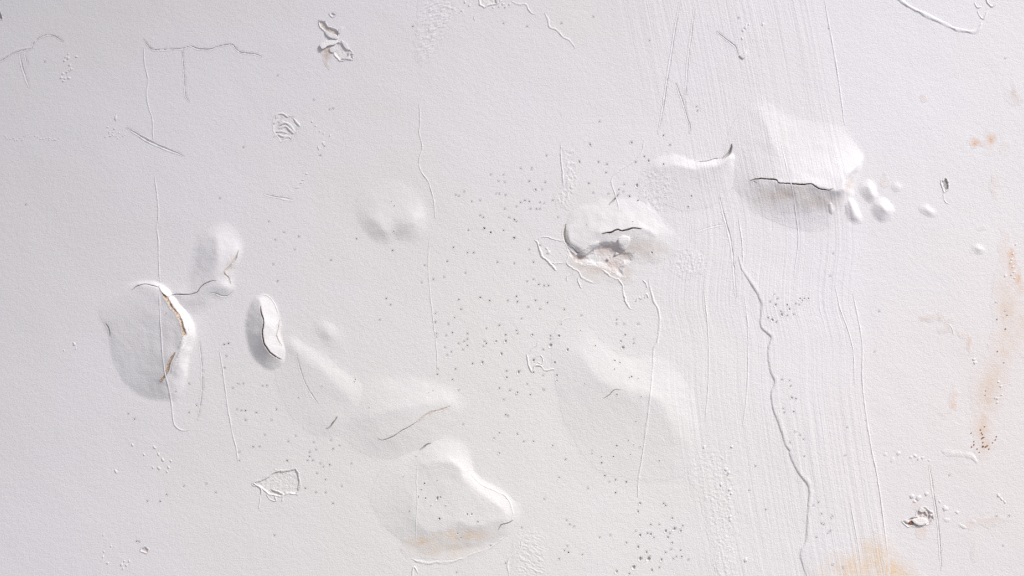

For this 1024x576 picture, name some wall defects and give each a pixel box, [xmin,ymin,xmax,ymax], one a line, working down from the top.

peeling [318,12,354,70]
crack [143,38,263,139]
peeling [251,468,301,509]